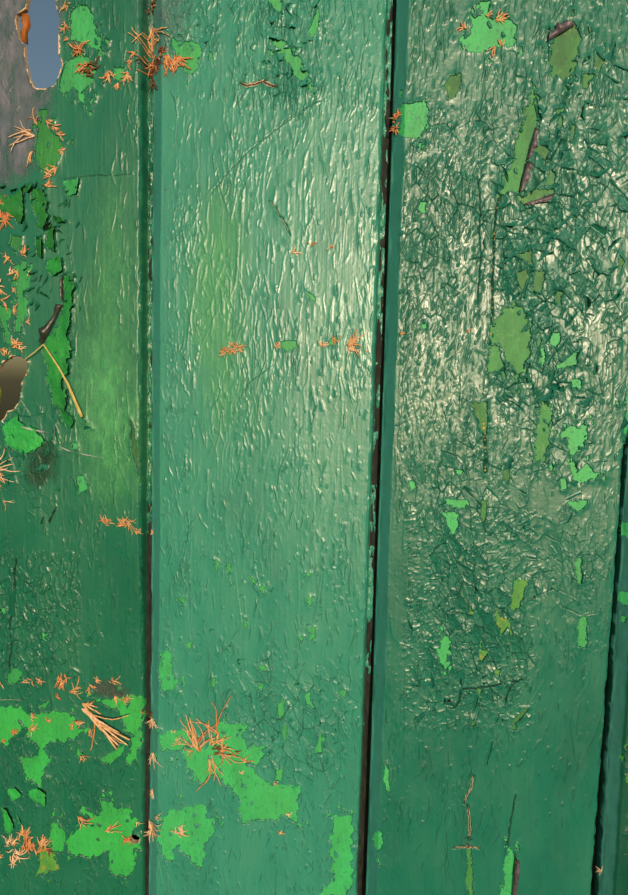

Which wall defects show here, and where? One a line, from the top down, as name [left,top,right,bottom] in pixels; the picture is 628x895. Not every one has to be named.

peeling [459,1,523,63]
crack [241,79,277,88]
peeling [393,91,429,148]
crack [478,182,501,335]
peeling [0,110,102,487]
peeling [618,591,628,605]
peeling [0,700,224,884]
peeling [87,687,146,765]
peeling [155,700,308,827]
crack [453,679,522,709]
peeling [317,805,358,895]
peeling [499,838,520,895]